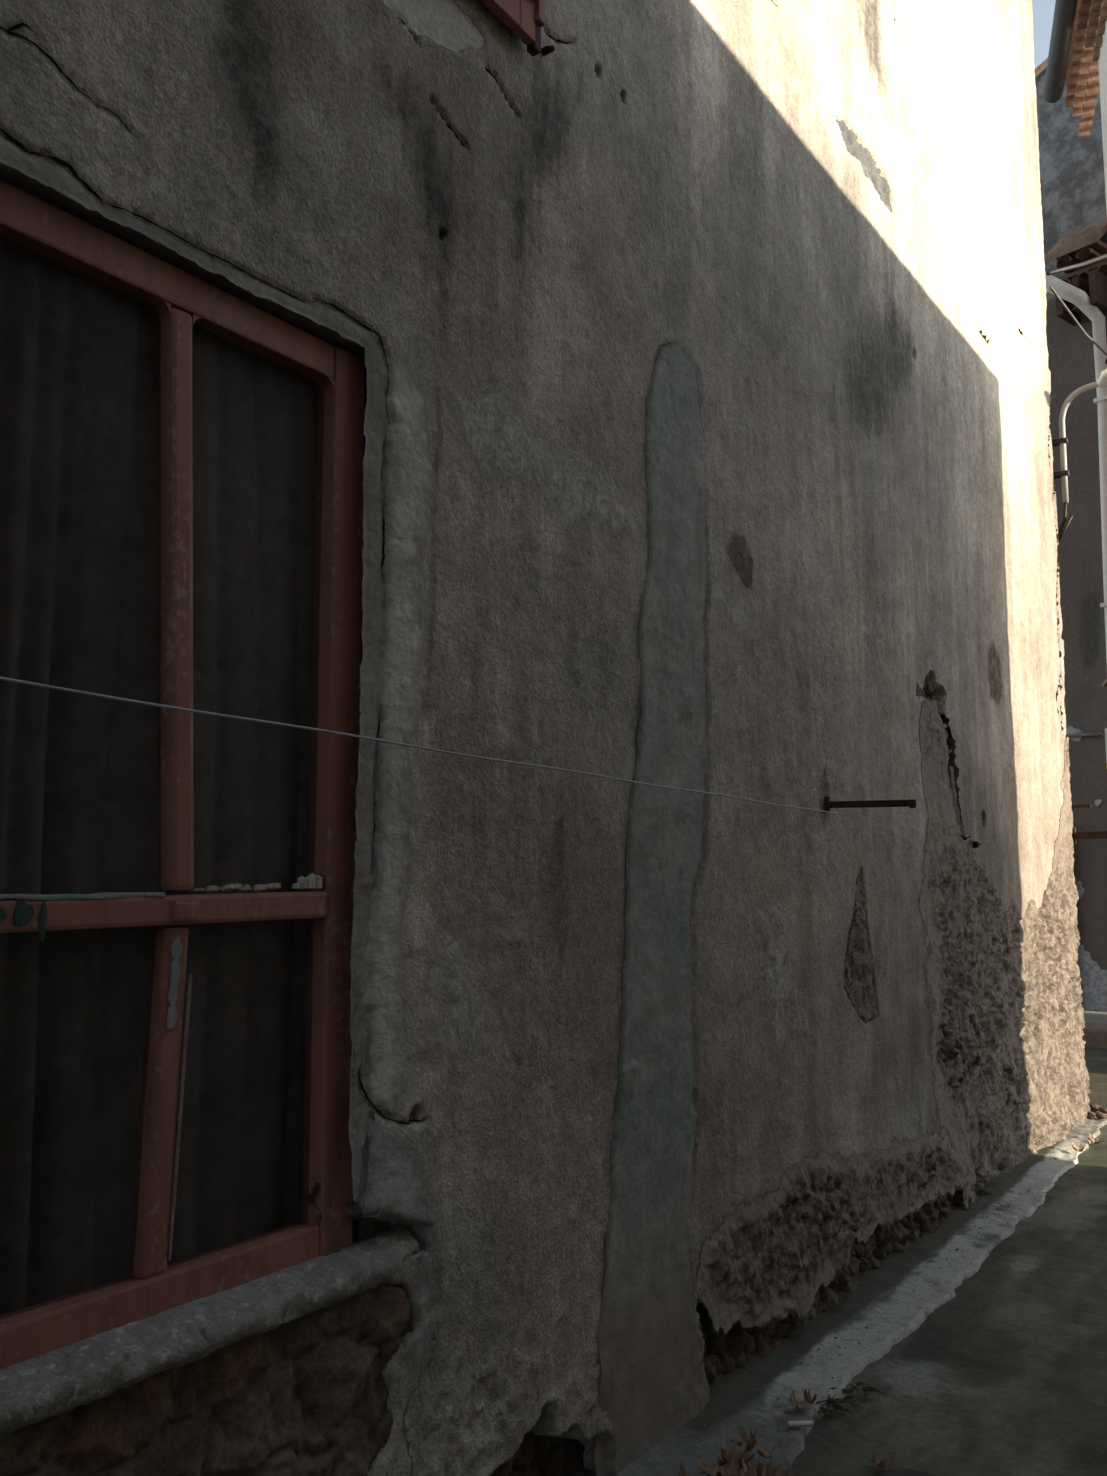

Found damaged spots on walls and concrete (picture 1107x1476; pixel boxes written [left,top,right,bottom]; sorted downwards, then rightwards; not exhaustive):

crack [0,22,132,133]
flaking render [835,115,893,212]
flaking render [696,674,1107,1382]